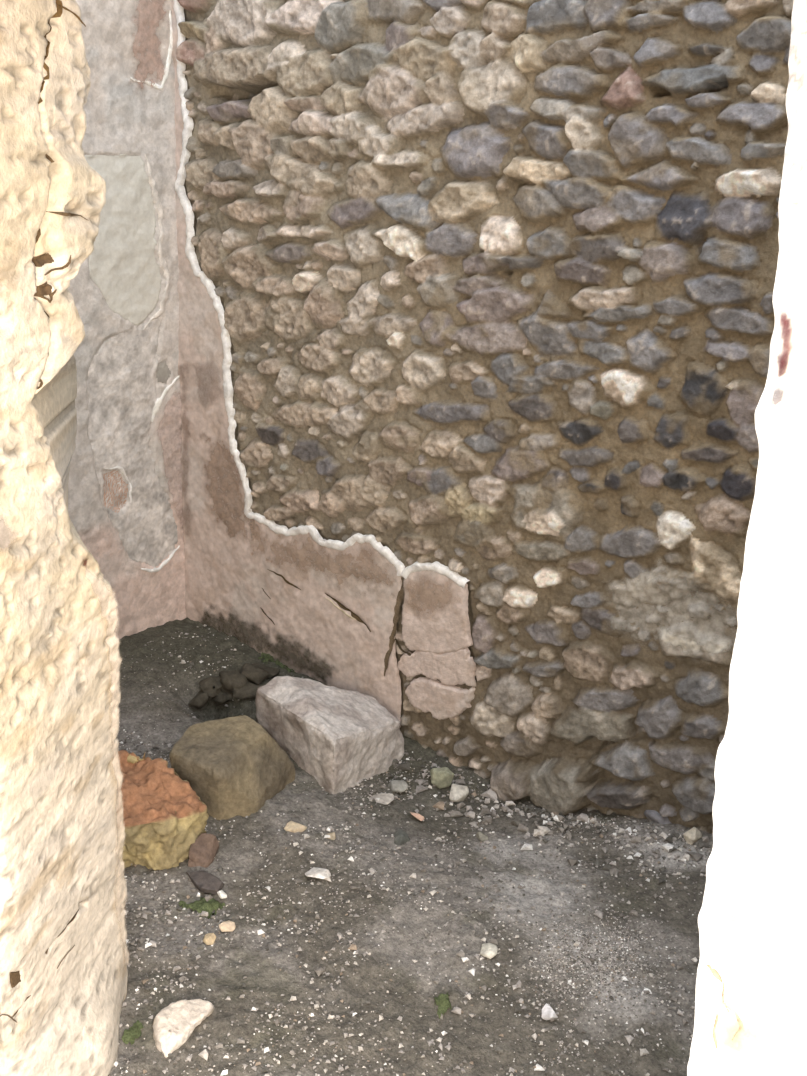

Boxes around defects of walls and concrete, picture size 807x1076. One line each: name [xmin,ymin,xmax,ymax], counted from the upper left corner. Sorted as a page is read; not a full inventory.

crack [38,0,86,104]
flaking render [85,0,476,727]
flaking render [86,571,129,964]
crack [261,569,411,677]